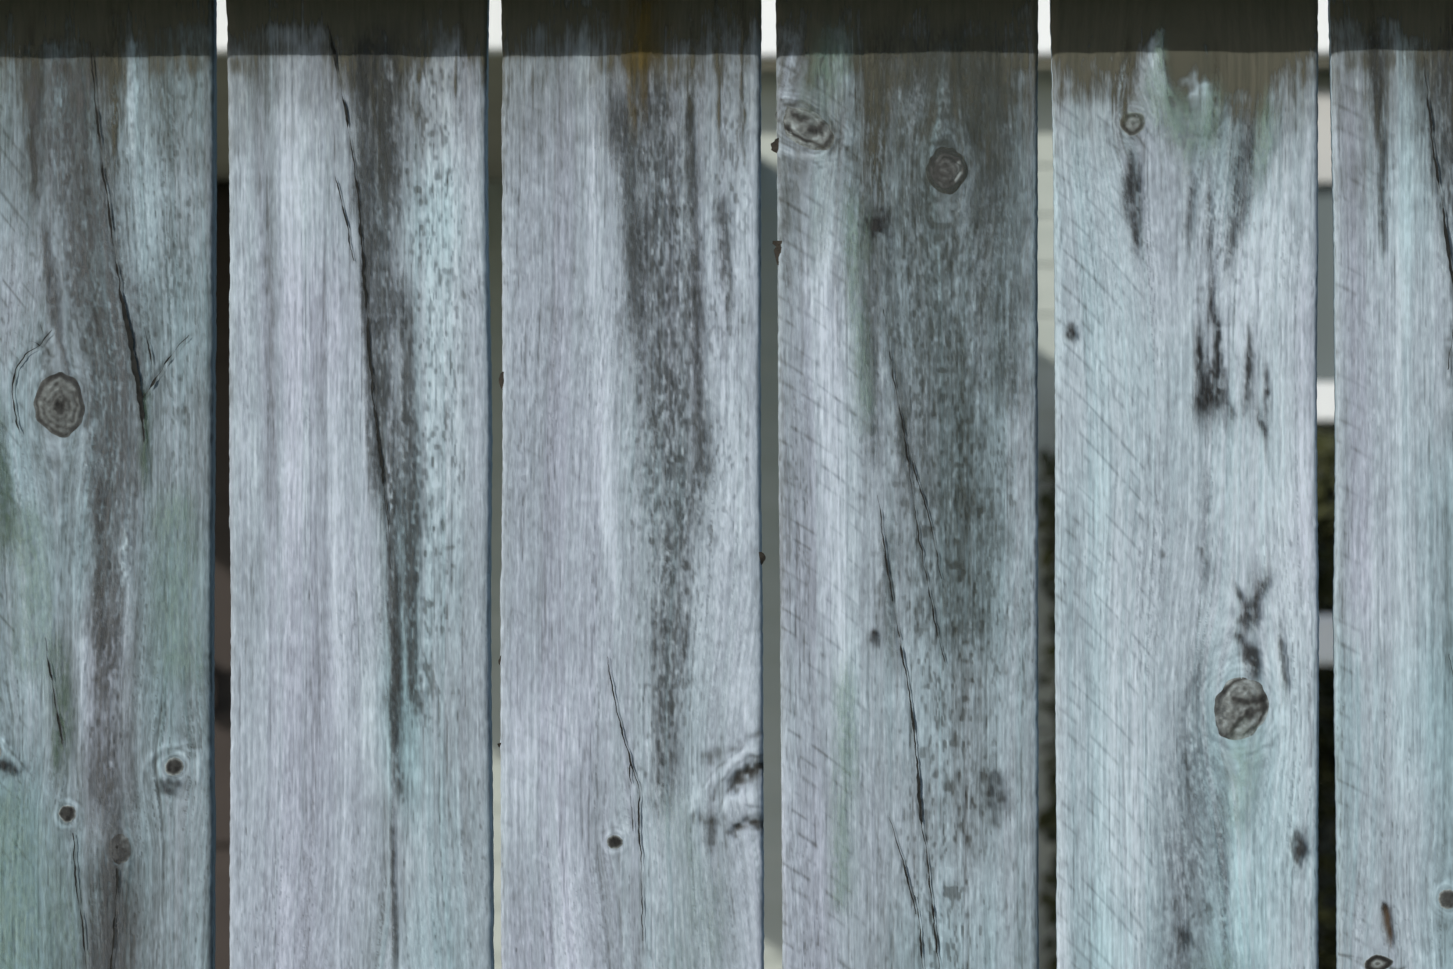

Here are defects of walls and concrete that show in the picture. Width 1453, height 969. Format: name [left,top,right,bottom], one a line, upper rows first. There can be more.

crack [90,43,189,442]
leakage [0,0,761,969]
crack [877,310,945,968]
leakage [776,0,1453,573]
crack [1424,58,1453,284]